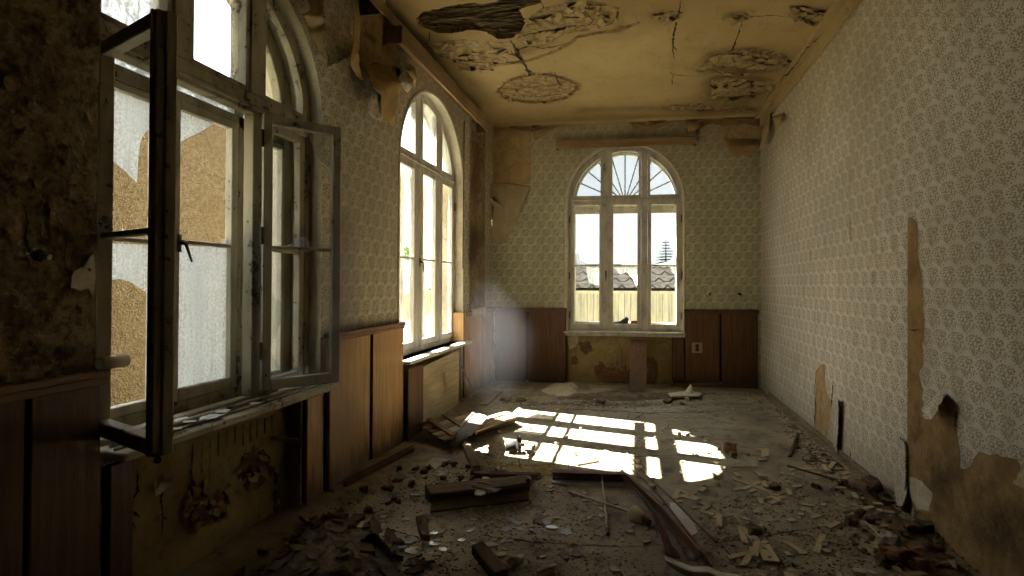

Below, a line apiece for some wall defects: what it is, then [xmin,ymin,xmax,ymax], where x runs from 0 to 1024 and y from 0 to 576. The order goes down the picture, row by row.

peeling [358,0,619,73]
crack [510,40,567,76]
crack [671,1,684,83]
peeling [649,47,791,140]
peeling [787,5,824,27]
spalling [568,340,630,383]
spalling [179,443,274,534]